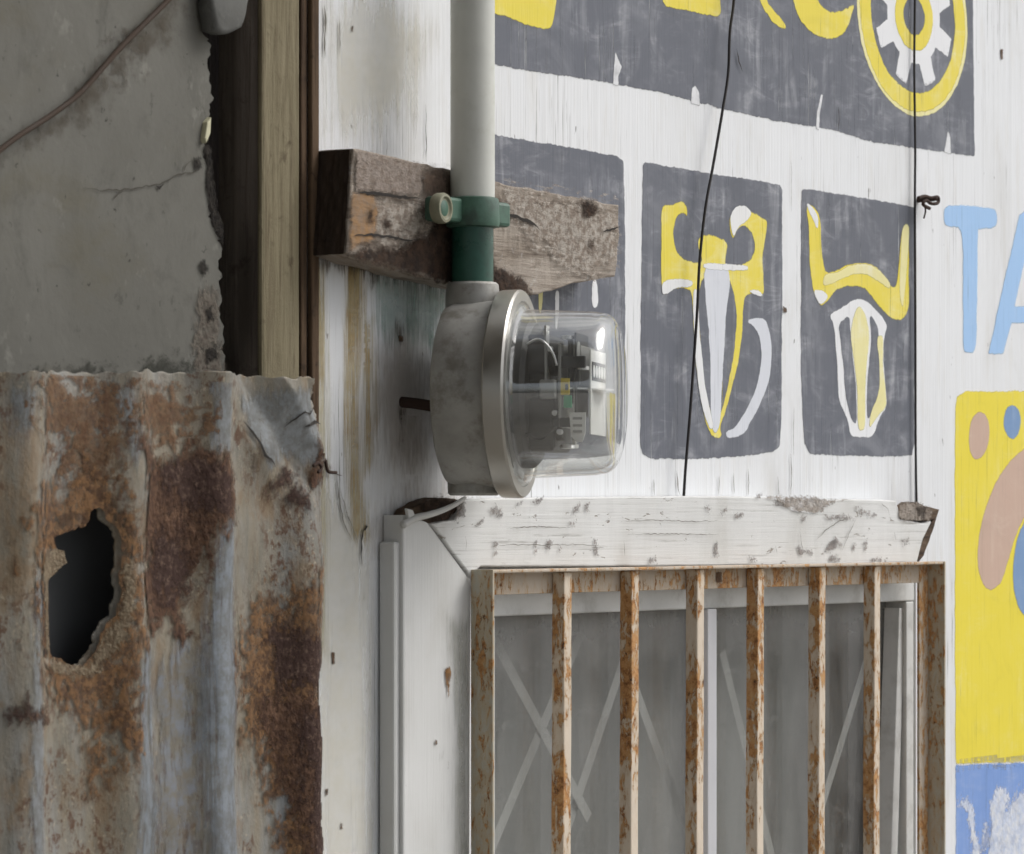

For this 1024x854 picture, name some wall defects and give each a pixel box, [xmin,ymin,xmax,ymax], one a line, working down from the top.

crack [87,161,202,198]
flaking render [194,117,224,246]
flaking render [192,285,226,372]
rust [264,438,325,518]
peeling [757,494,877,521]
peeling [798,537,882,562]
peeling [899,501,932,521]
rust [3,373,239,809]
rust [233,554,324,854]